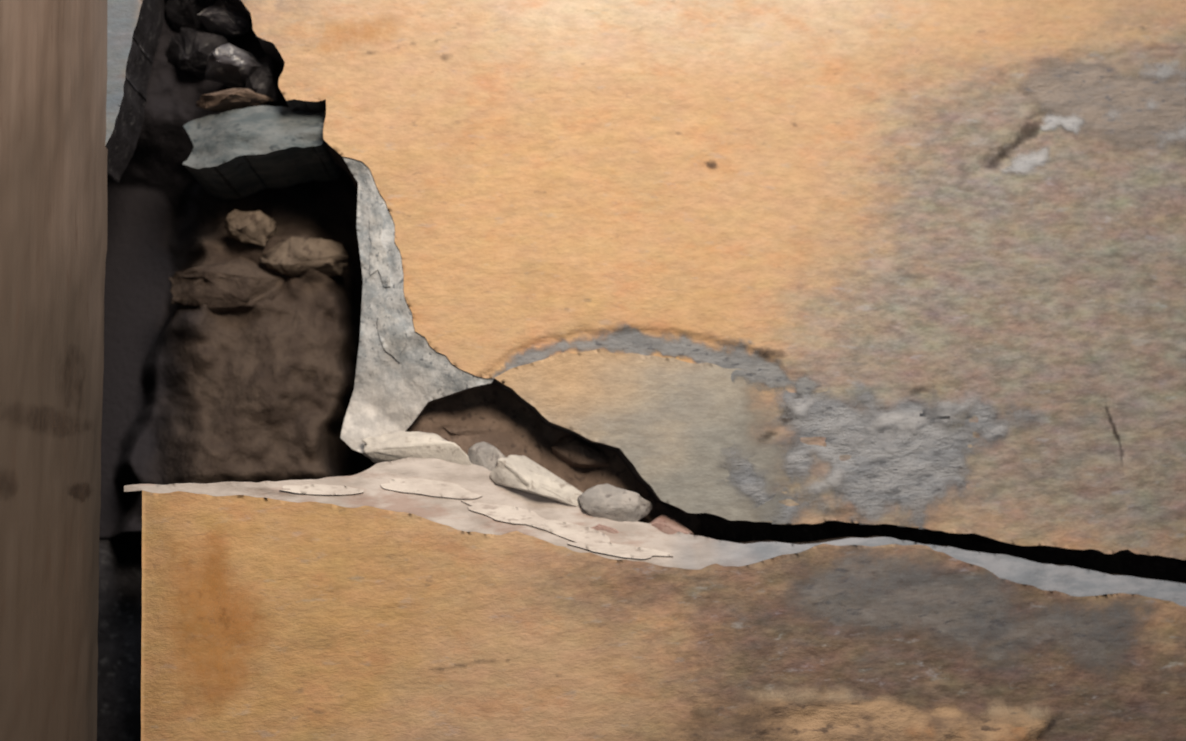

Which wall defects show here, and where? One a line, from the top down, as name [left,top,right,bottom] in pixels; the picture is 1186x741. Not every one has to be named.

spalling [99,0,1186,607]
crack [406,383,1186,583]